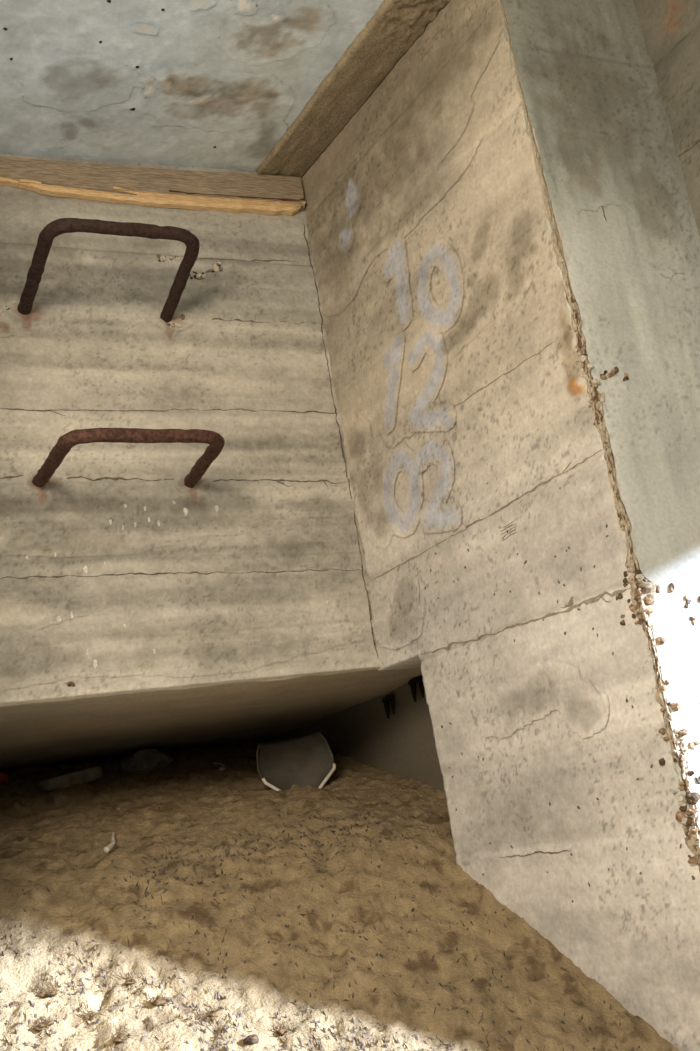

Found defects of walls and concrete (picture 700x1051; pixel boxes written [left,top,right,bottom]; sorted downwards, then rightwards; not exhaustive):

leakage [18,0,335,172]
rust [6,299,54,335]
rust [154,308,194,343]
spalling [498,0,700,880]
rust [23,471,68,510]
rust [174,473,214,511]
crack [501,850,570,858]